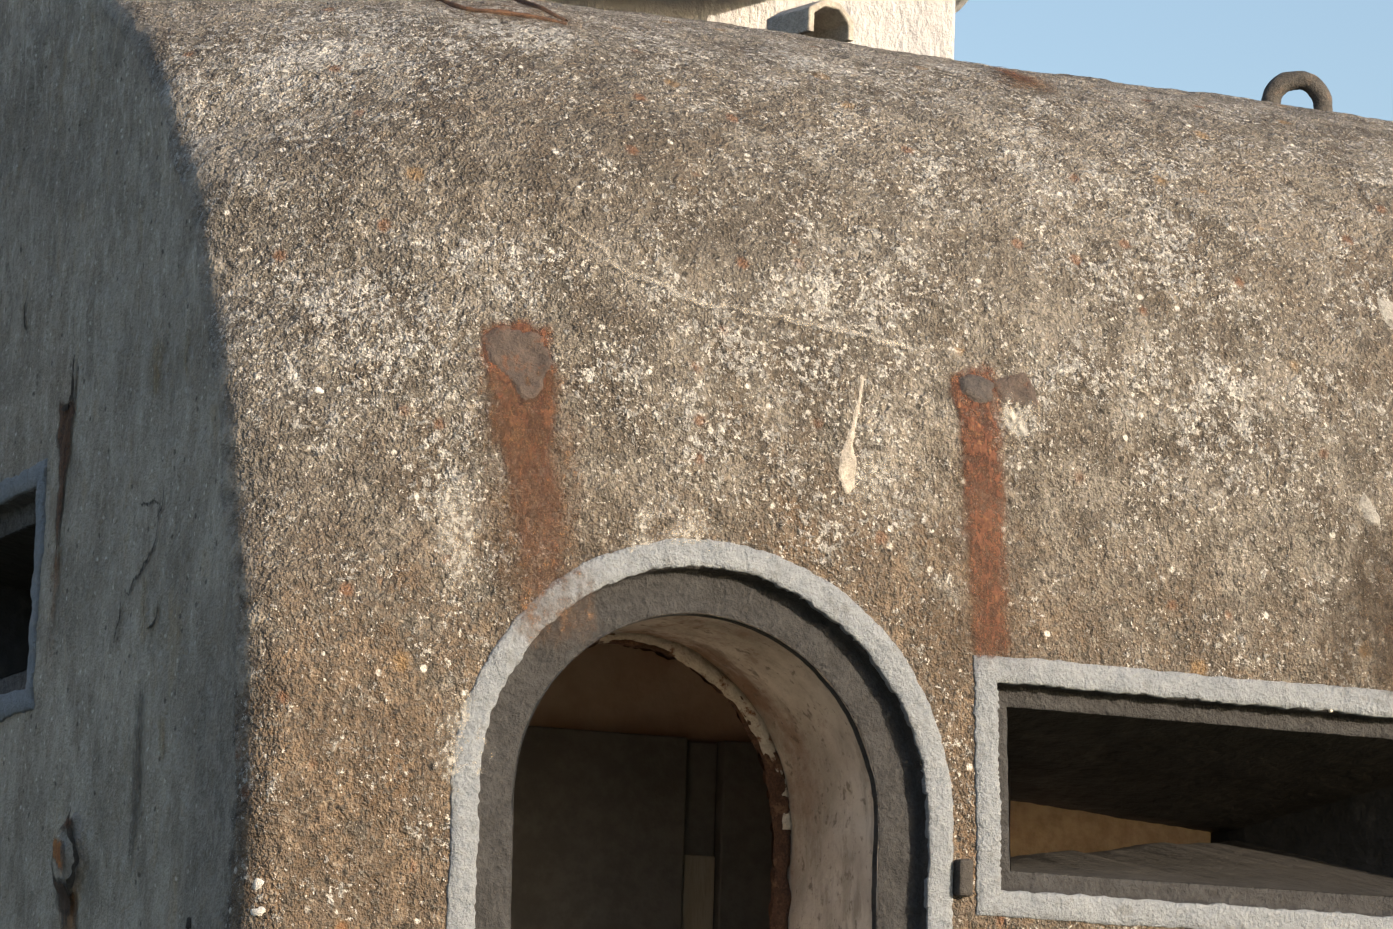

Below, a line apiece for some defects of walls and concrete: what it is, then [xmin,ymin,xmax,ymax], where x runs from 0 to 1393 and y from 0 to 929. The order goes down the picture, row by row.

rust [49,399,74,641]
crack [112,487,164,664]
rust [952,368,1039,657]